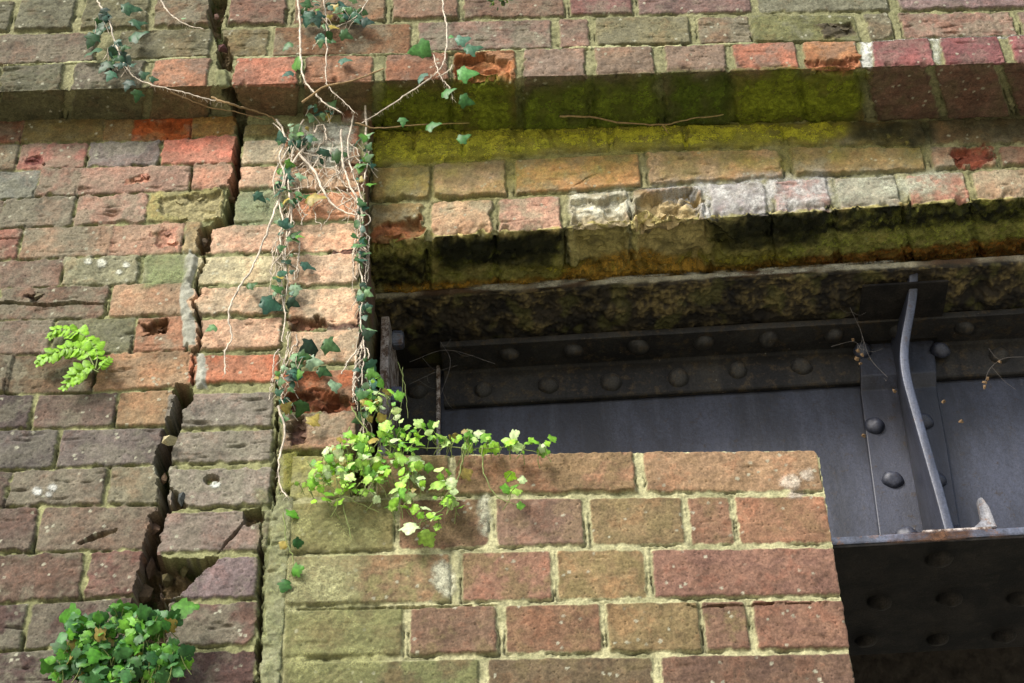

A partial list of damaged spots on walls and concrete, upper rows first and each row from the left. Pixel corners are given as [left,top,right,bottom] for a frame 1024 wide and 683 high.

spalling [452,51,516,85]
water stain [372,38,946,162]
spalling [947,141,998,172]
water stain [371,256,427,288]
water stain [437,231,563,269]
water stain [571,191,634,219]
spalling [568,186,729,275]
water stain [663,173,1024,249]
crack [130,0,265,648]
spalling [281,386,357,448]